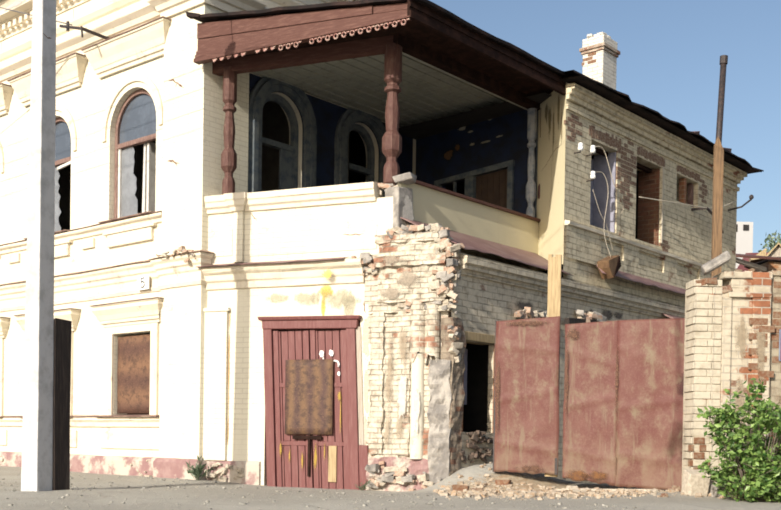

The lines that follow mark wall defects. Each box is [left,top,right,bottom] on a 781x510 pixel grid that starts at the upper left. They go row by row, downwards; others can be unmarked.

flaking render [377,183,401,195]
rust [117,334,150,414]
rust [285,359,333,435]
spalling [345,195,484,492]
flaking render [730,282,781,400]